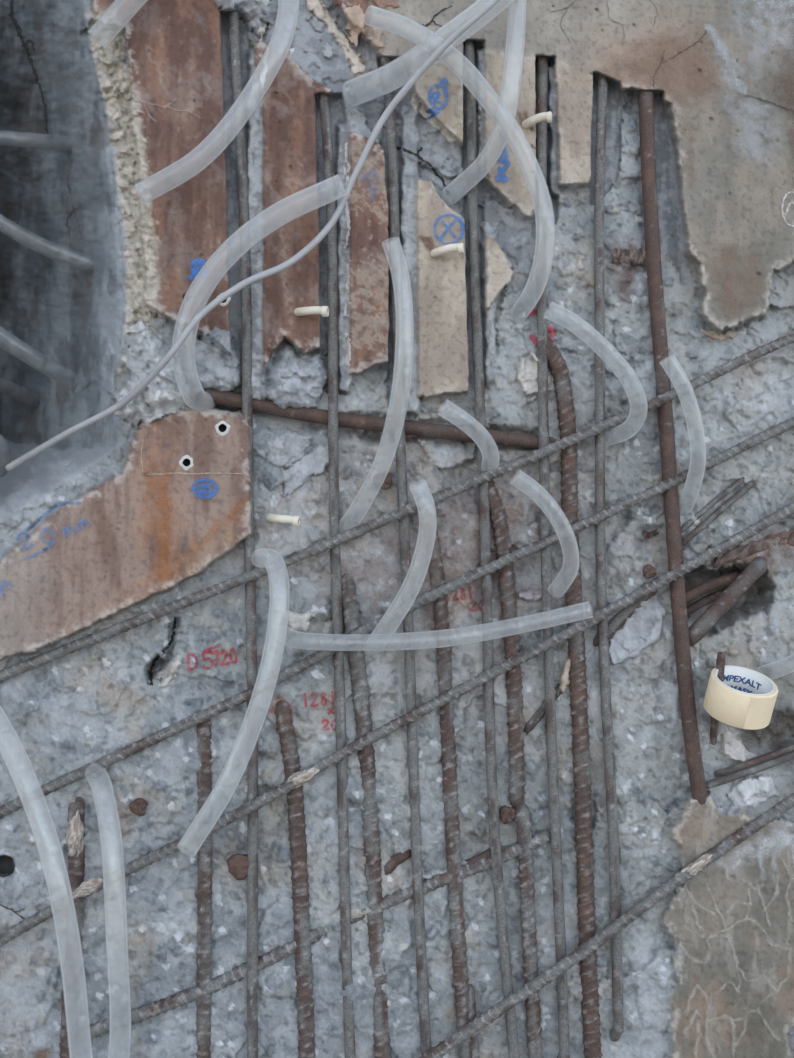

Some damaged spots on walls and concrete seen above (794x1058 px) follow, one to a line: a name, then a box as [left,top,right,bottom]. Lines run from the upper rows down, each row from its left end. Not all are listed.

crack [552,1,575,44]
crack [653,26,709,88]
crack [743,94,794,112]
spalling [0,0,794,806]
spalling [0,407,794,1058]